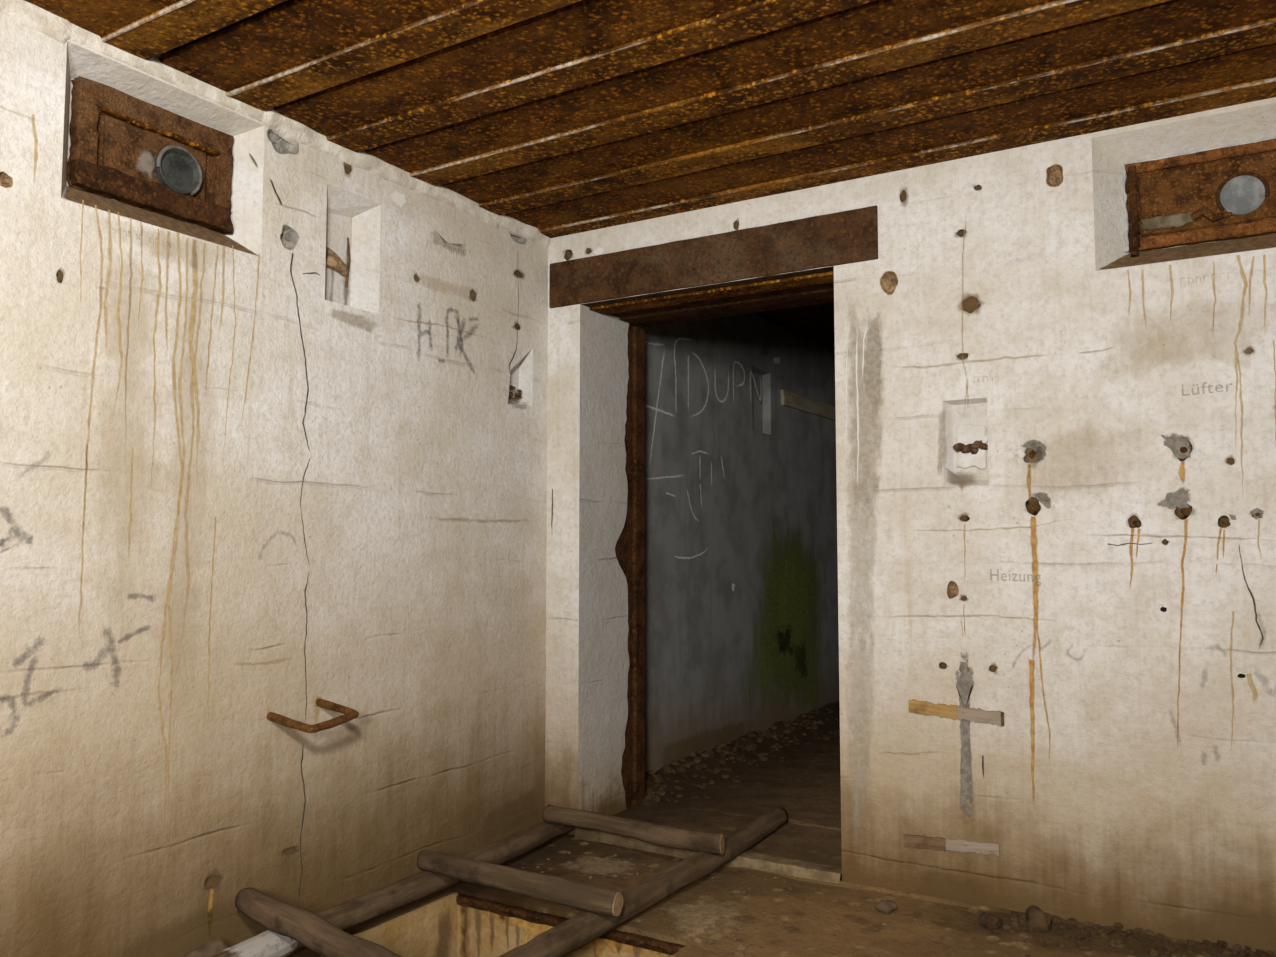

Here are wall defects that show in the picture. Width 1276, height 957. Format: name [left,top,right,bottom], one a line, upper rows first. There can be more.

rust [64,186,260,749]
crack [290,253,319,897]
rust [1029,516,1050,798]
rust [1130,528,1140,585]
rust [1177,519,1188,731]
rust [1100,233,1276,472]